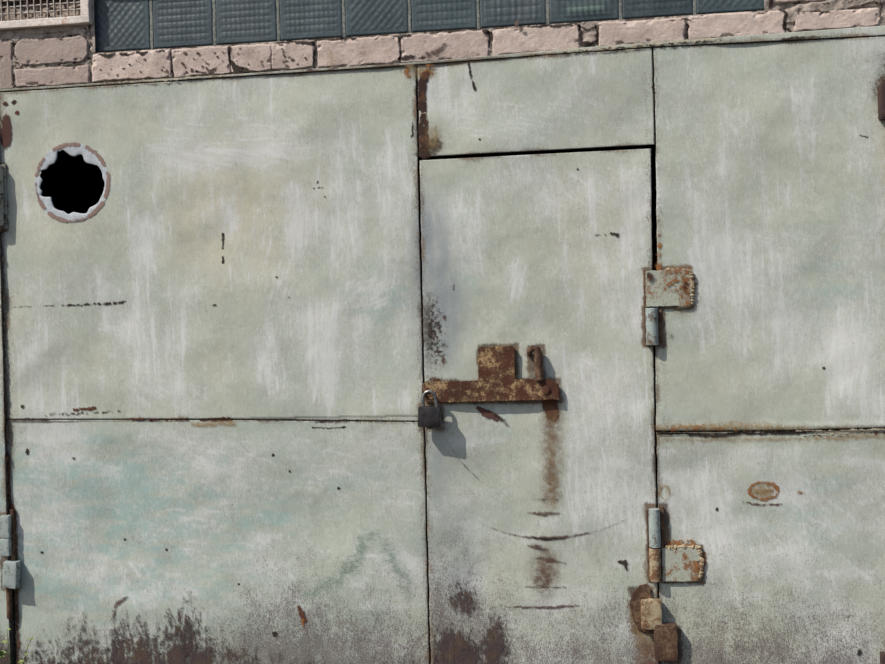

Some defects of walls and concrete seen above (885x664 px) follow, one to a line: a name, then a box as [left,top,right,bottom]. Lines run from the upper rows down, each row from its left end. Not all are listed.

corrosion [0,100,19,149]
corrosion [403,64,442,159]
corrosion [647,234,698,308]
corrosion [422,305,446,364]
corrosion [542,400,559,498]
corrosion [657,423,885,441]
corrosion [743,481,782,506]